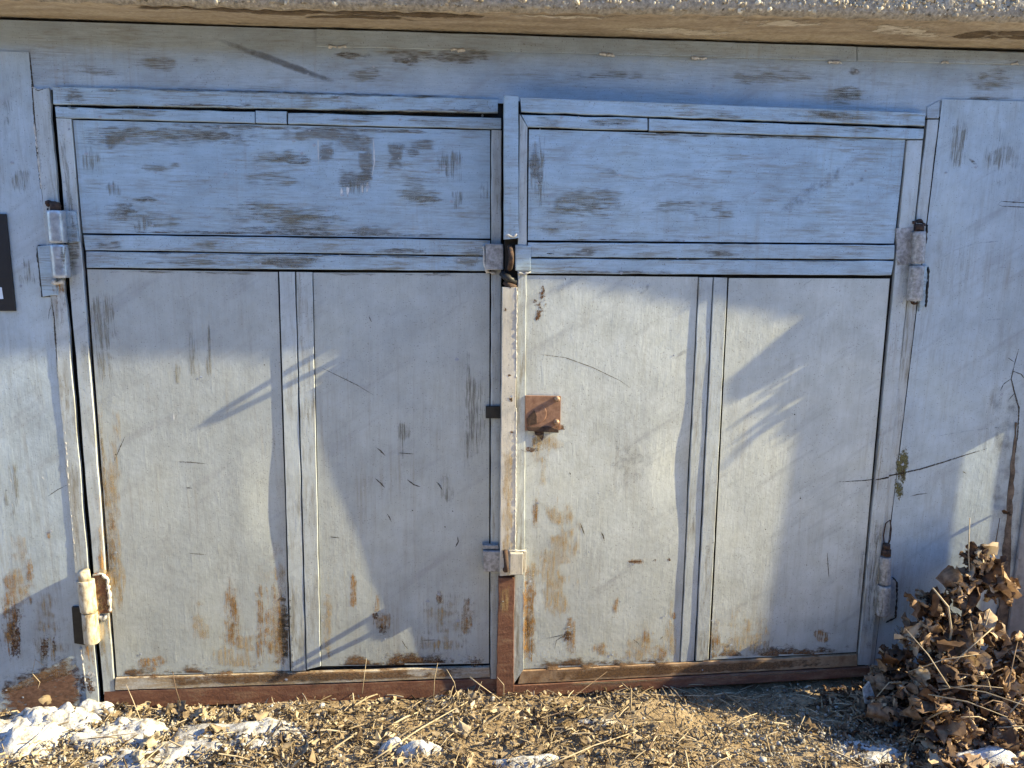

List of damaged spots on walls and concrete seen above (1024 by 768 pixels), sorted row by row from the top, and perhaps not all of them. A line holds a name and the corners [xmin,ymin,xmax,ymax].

peeling [83,103,240,167]
peeling [270,120,372,187]
peeling [529,151,612,215]
rust [523,502,675,670]
rust [0,562,88,713]
rust [125,582,286,678]
rust [710,629,833,658]